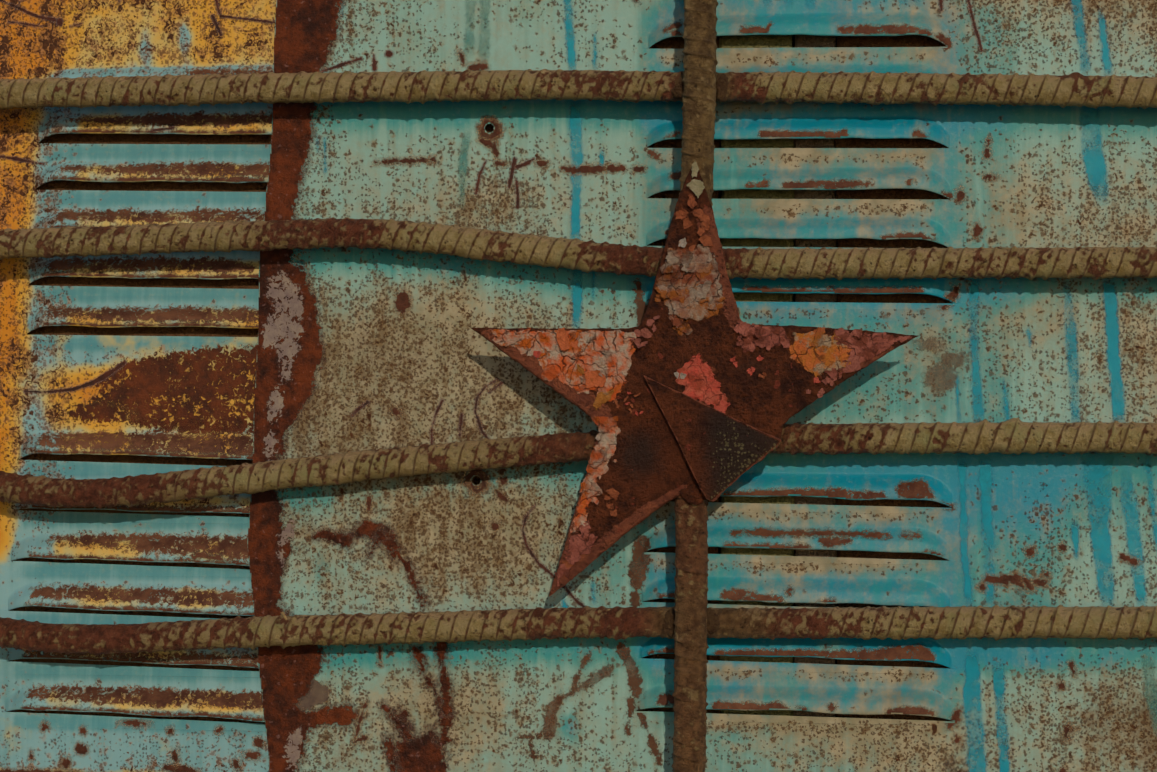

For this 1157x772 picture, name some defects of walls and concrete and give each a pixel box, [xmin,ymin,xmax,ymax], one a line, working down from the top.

rust [185,0,343,75]
rust [50,102,317,228]
rust [24,249,325,463]
peeling [490,161,730,587]
peeling [730,321,912,398]
rust [29,490,299,617]
rust [626,535,653,607]
rust [724,527,941,555]
rust [723,479,955,511]
rust [22,642,454,772]
rust [517,641,663,766]
rust [715,645,935,662]